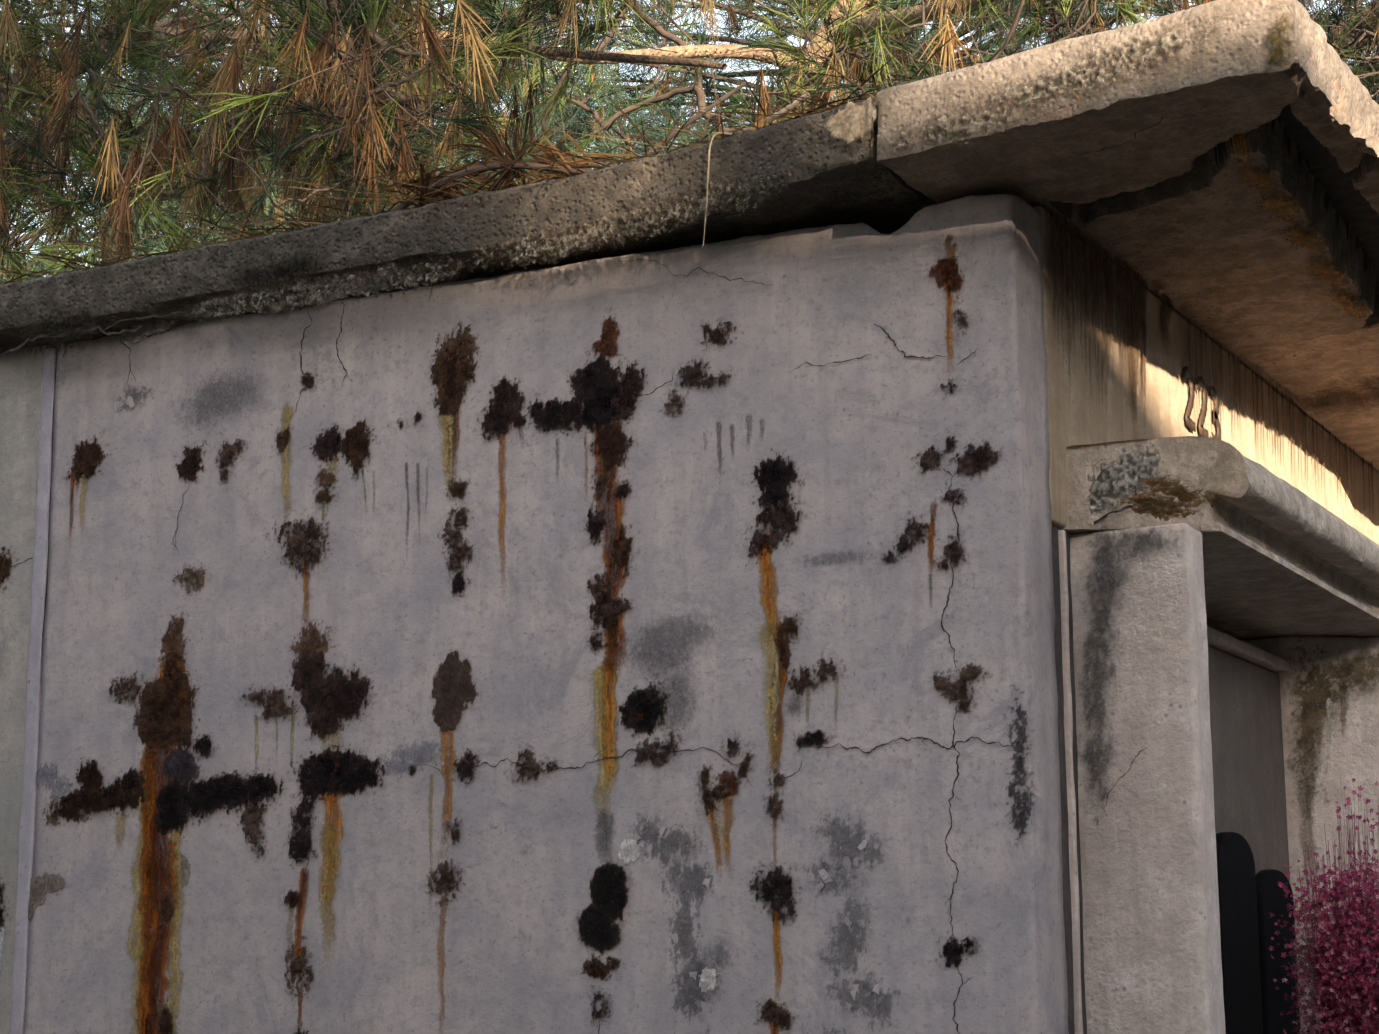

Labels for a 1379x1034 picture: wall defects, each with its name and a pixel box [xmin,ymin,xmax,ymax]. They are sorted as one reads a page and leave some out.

rust [46,404,388,1034]
rust [397,322,479,597]
rust [409,650,480,1012]
rust [477,316,681,1026]
crack [422,706,1015,1034]
rust [698,450,838,1034]
crack [790,324,976,372]
crack [941,469,960,668]
damp [1006,692,1035,838]
damp [1051,209,1172,415]
damp [1080,528,1177,801]
damp [1287,647,1379,855]